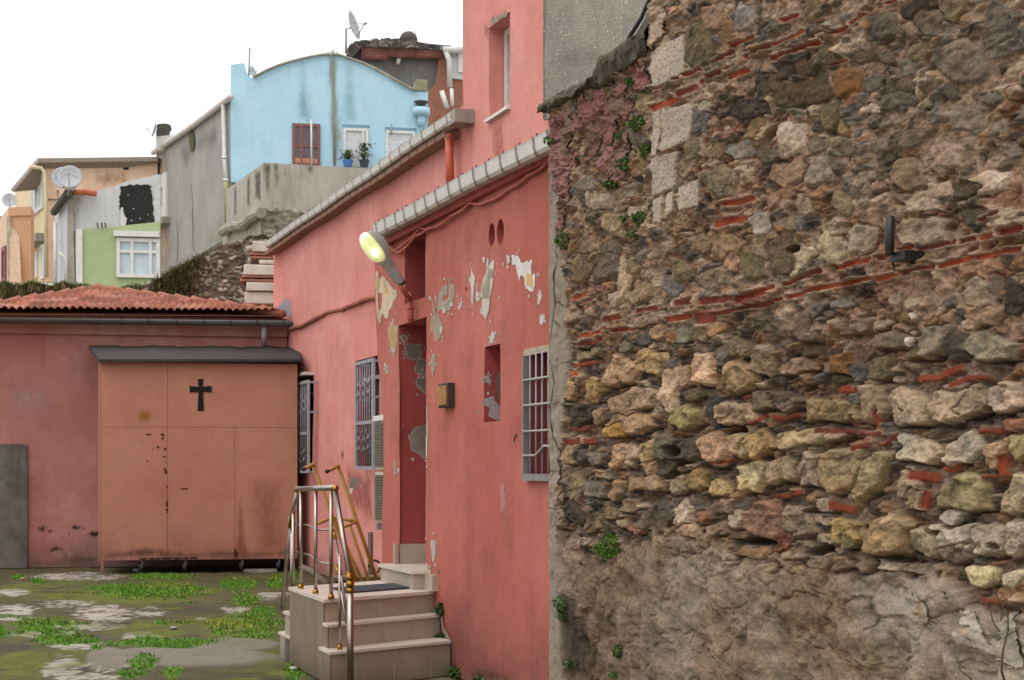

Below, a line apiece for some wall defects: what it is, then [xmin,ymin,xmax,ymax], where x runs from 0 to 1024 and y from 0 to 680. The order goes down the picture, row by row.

damp [234,165,276,203]
peeling [375,249,546,468]